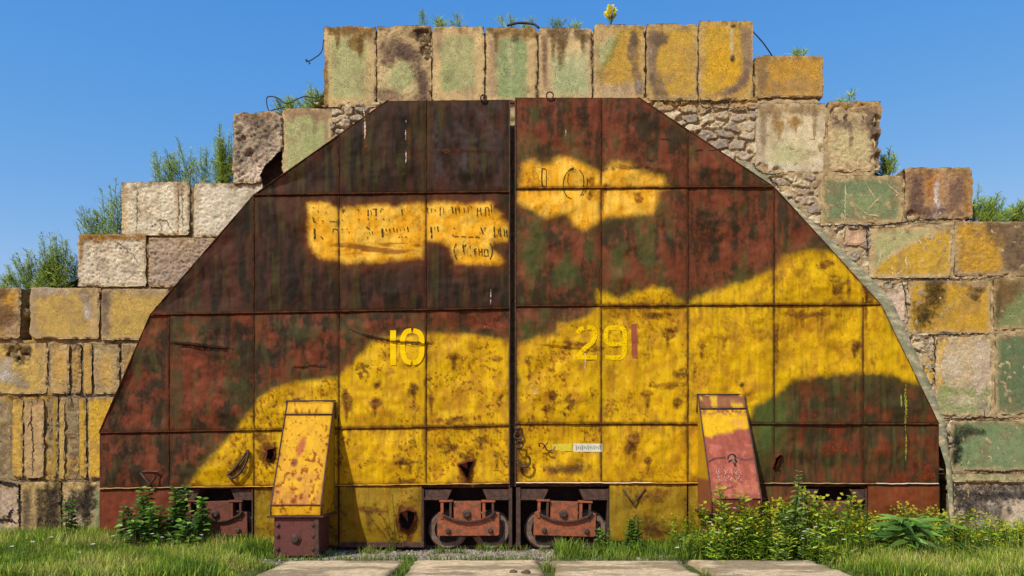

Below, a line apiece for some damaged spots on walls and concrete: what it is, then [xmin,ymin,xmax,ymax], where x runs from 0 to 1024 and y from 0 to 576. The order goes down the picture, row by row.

damp [381,39,428,101]
spalling [234,113,281,175]
damp [912,281,944,325]
corrosion [641,368,696,407]
crack [0,393,108,535]
corrosion [437,437,486,483]
corrosion [625,433,652,469]
damp [23,482,97,531]